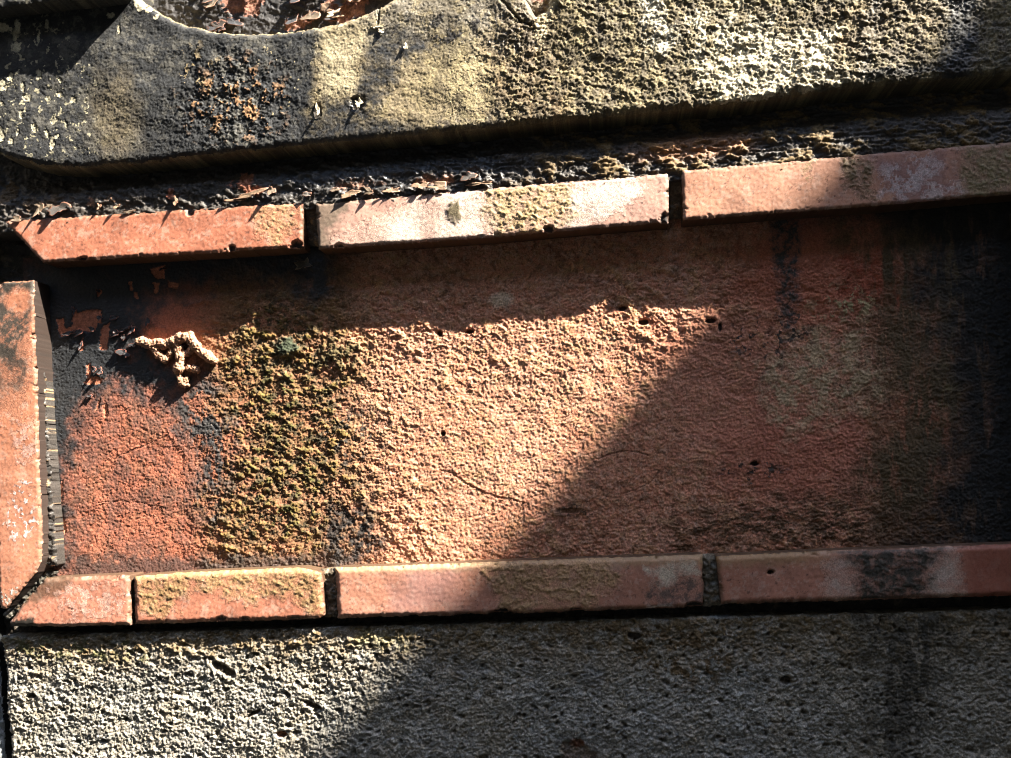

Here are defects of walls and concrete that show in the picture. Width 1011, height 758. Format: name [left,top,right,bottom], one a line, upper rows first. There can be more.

peeling [0,19,25,61]
peeling [133,0,160,20]
flaking render [170,0,387,149]
crack [501,0,535,27]
water stain [632,0,986,107]
peeling [0,68,68,151]
peeling [56,306,151,358]
peeling [83,363,109,418]
water stain [159,372,245,524]
crack [439,469,527,504]